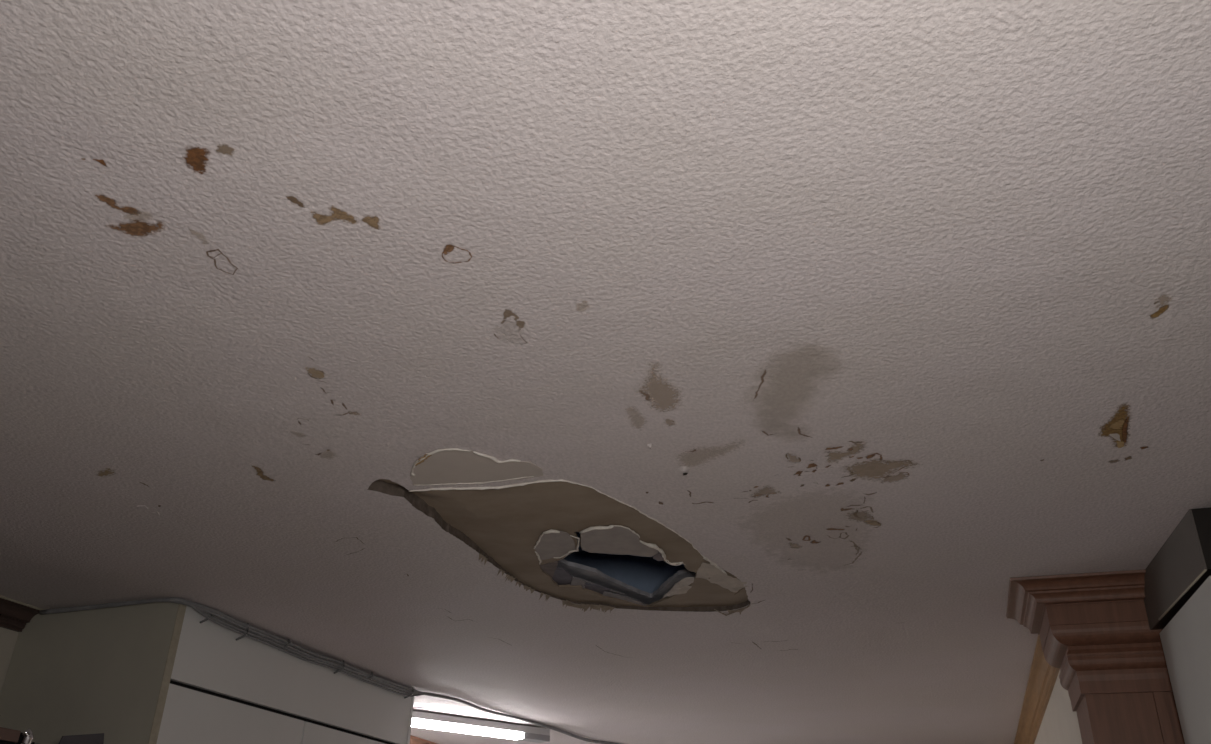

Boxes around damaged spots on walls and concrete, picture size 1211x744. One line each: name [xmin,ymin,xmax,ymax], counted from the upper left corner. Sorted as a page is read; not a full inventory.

spalling [1099,404,1130,448]
peeling [786,441,917,565]
peeling [535,526,659,560]